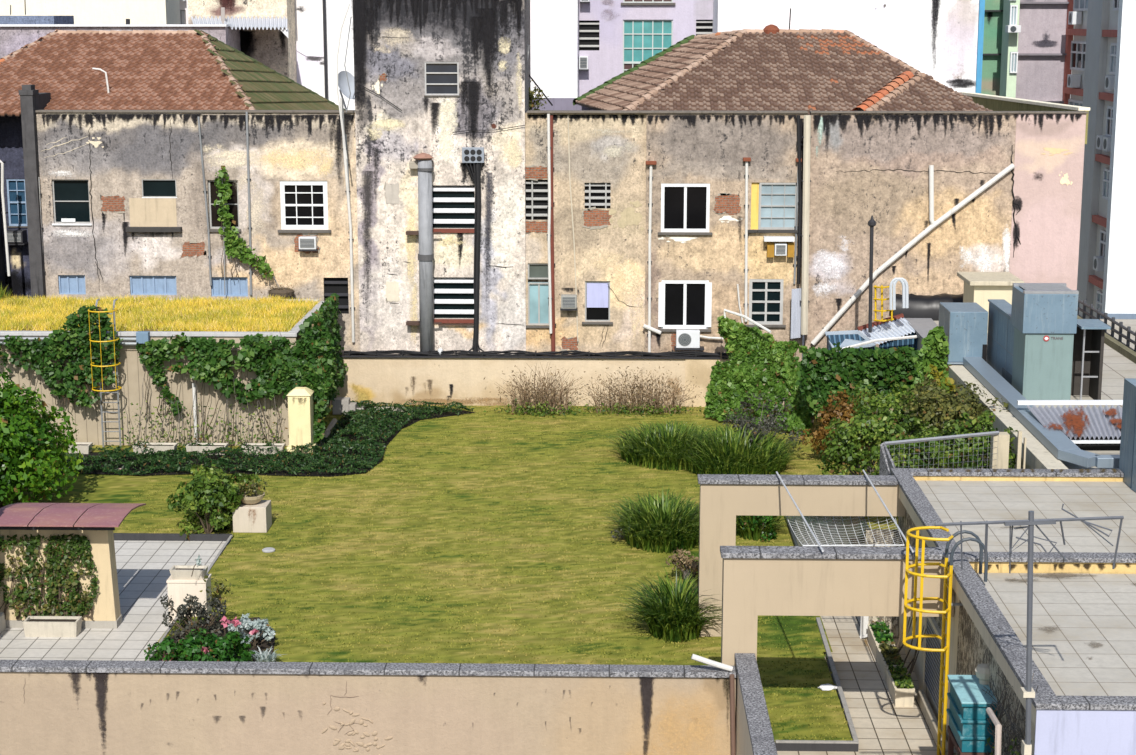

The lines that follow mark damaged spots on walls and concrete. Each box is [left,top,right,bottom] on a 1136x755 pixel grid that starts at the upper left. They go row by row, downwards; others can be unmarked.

water stain [931,0,940,63]
water stain [42,0,522,176]
water stain [527,114,1082,188]
crack [42,128,103,290]
spalling [100,194,127,214]
spalling [180,240,207,258]
spalling [582,207,616,230]
spalling [713,192,741,223]
rust [1043,407,1089,437]
rust [1103,408,1122,429]
water stain [71,672,116,741]
water stain [639,677,654,755]